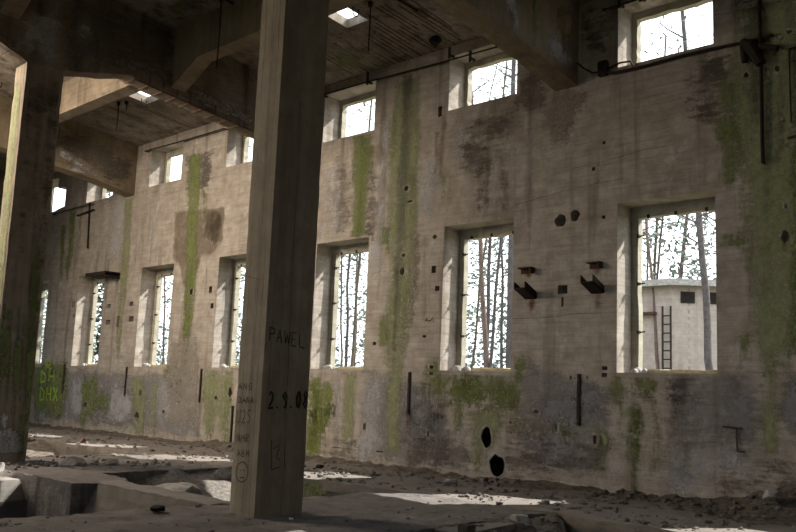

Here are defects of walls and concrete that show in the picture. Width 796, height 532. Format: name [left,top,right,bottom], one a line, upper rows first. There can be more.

damp [0,99,46,454]
damp [174,154,224,375]